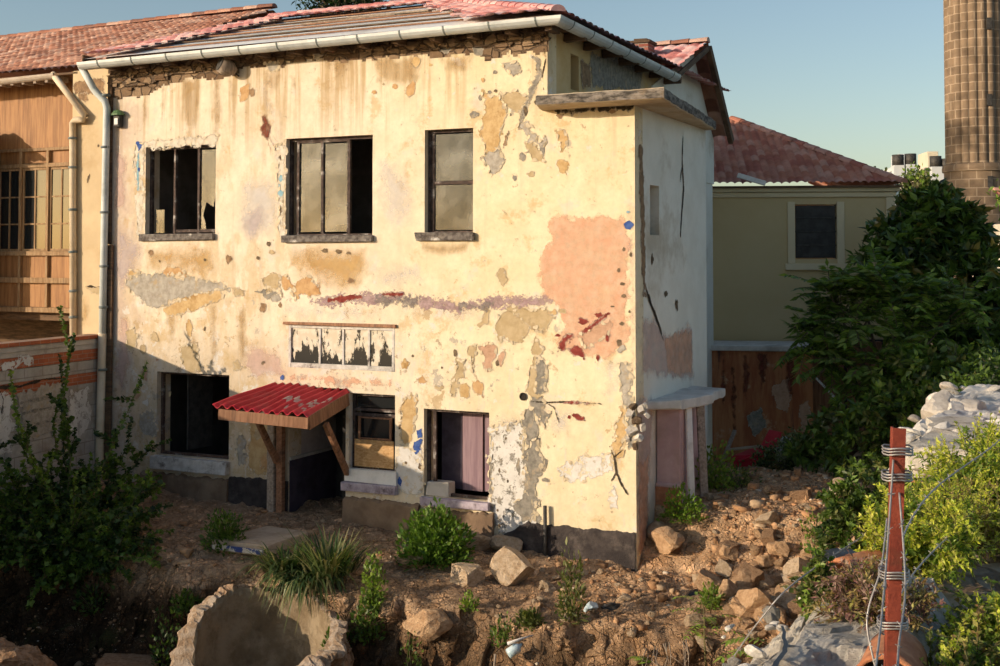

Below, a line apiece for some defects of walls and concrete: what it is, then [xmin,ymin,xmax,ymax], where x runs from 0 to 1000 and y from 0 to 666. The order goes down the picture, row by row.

flaking render [73,26,643,181]
crack [678,145,686,237]
flaking render [123,250,321,374]
peeling [496,268,508,287]
crack [646,287,664,341]
peeling [0,354,34,372]
flaking render [0,382,92,455]
peeling [395,305,566,535]
flaking render [578,310,650,466]
crack [609,446,628,495]